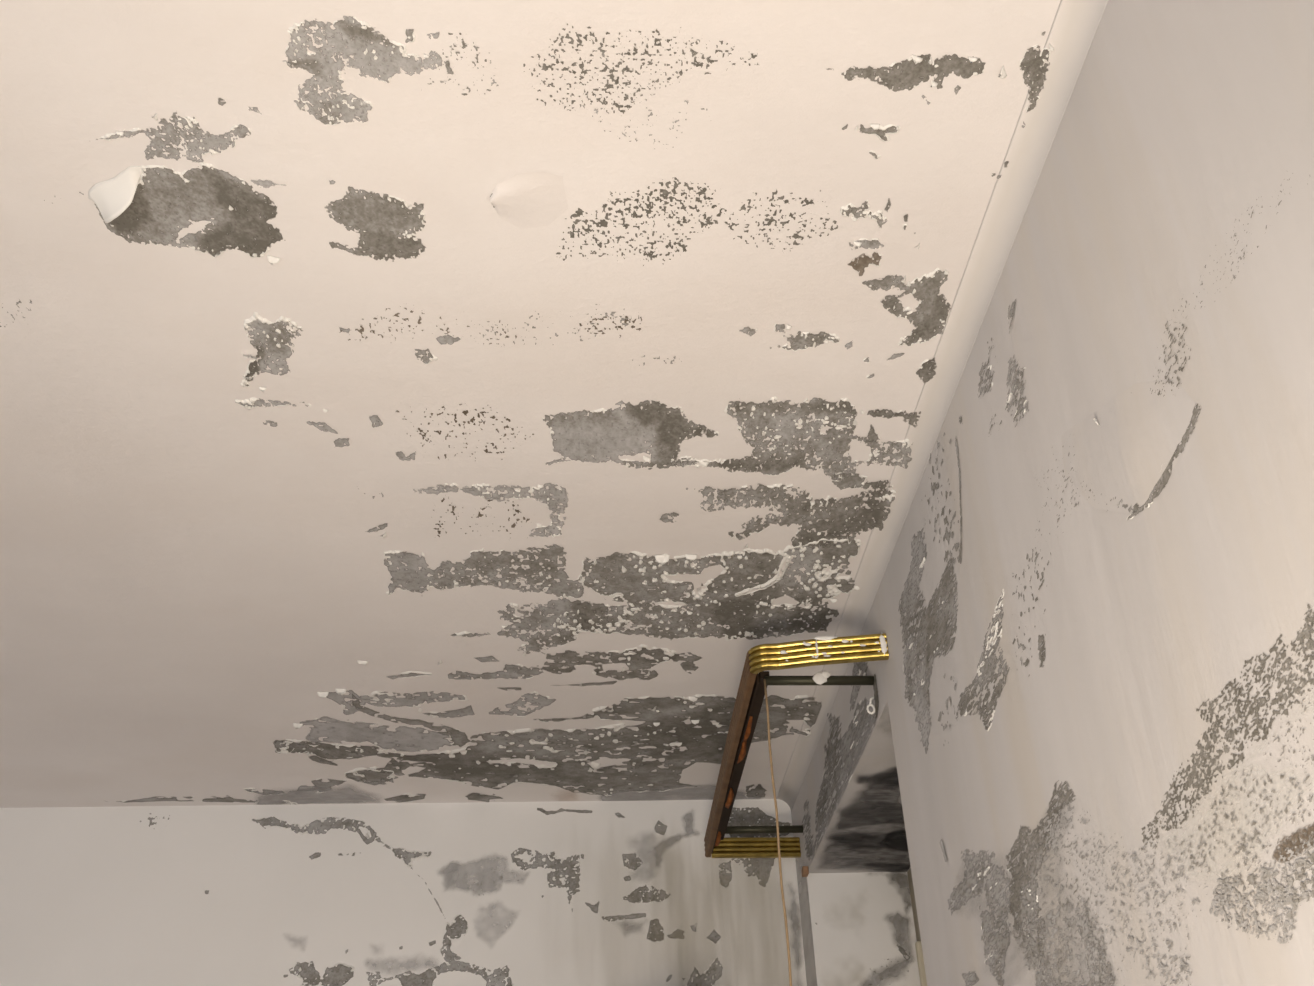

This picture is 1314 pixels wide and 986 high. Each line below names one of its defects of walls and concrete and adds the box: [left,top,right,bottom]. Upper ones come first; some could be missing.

peeling [282,16,453,125]
peeling [828,32,1054,128]
peeling [88,113,283,264]
peeling [235,311,349,447]
peeling [325,180,426,262]
peeling [774,324,852,351]
peeling [840,199,951,360]
peeling [916,358,937,383]
peeling [273,396,921,796]
peeling [899,417,1076,752]
peeling [948,604,1314,986]
peeling [284,914,513,986]